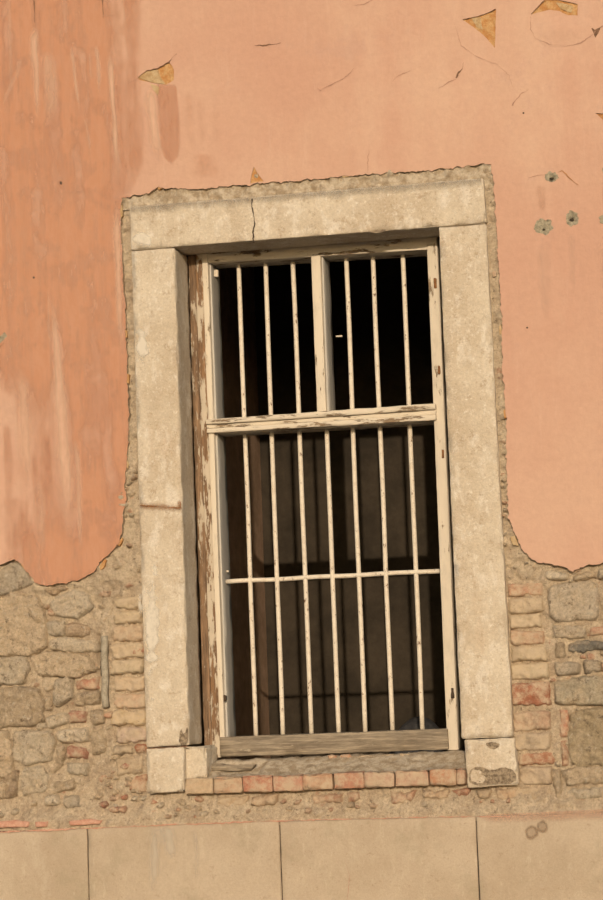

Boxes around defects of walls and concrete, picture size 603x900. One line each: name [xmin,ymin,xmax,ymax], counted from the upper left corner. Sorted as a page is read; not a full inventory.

spalling [464,8,496,48]
spalling [531,0,578,15]
spalling [129,54,176,94]
crack [438,33,526,106]
water stain [0,0,139,586]
spalling [0,164,603,833]